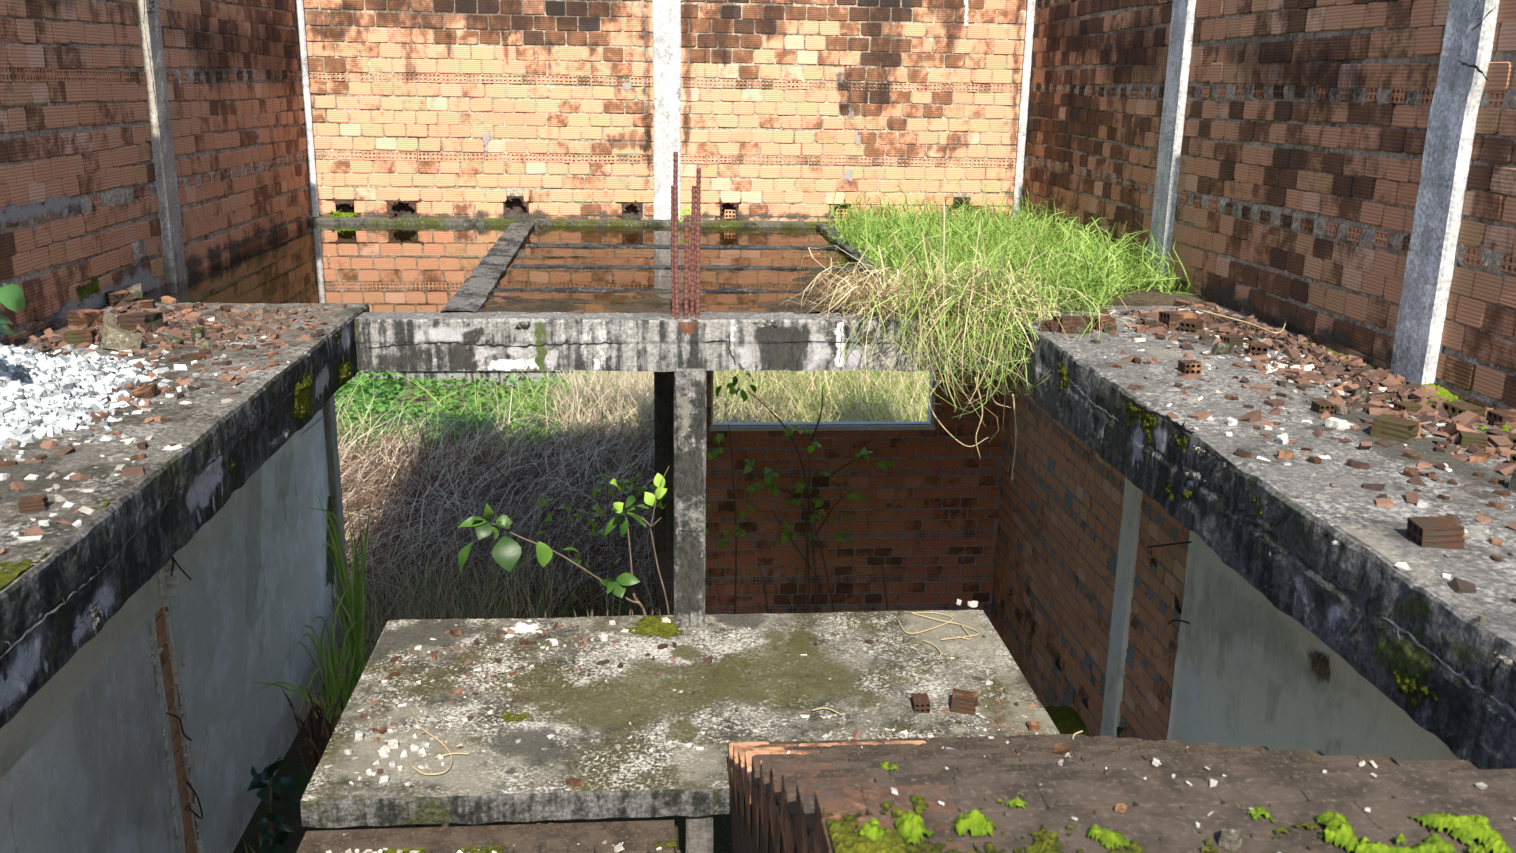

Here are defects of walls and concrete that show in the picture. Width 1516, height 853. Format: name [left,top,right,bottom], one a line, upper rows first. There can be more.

water stain [373,322,558,371]
water stain [737,322,915,371]
water stain [1031,345,1042,382]
water stain [0,440,81,500]
water stain [186,454,223,522]
water stain [1132,427,1230,521]
water stain [1285,380,1510,497]
crack [1070,381,1516,720]
water stain [72,584,115,649]
water stain [1294,576,1345,631]
water stain [0,632,48,729]
water stain [490,727,575,774]